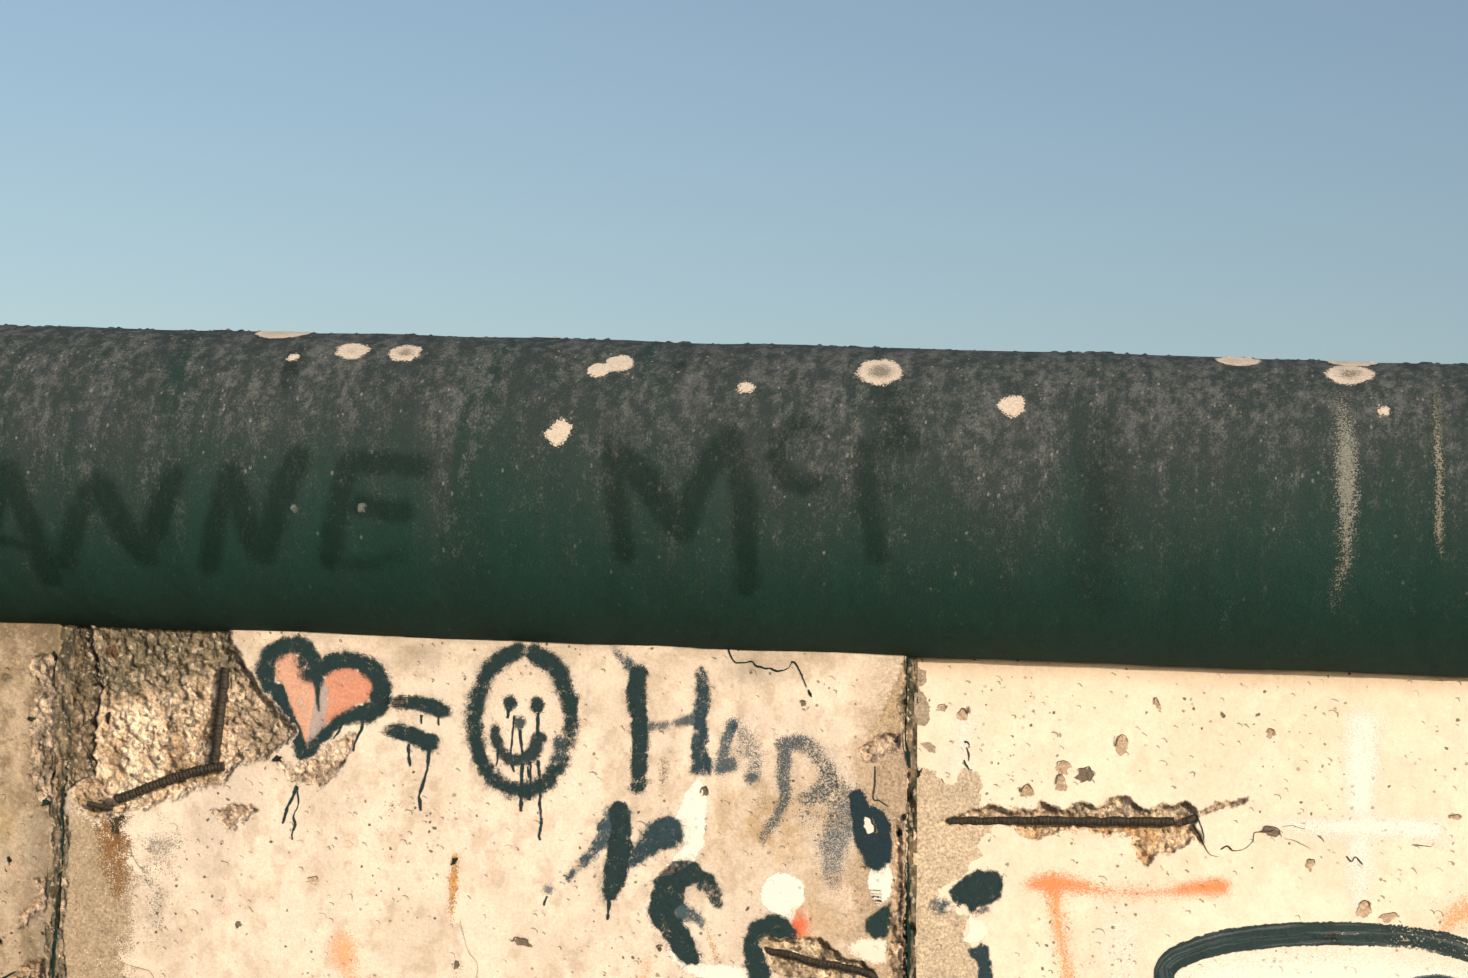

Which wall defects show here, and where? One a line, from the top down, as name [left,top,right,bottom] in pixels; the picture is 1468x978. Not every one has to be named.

leakage [1327,386,1364,612]
leakage [1429,388,1447,558]
spalling [0,625,357,978]
peeling [758,660,1250,978]